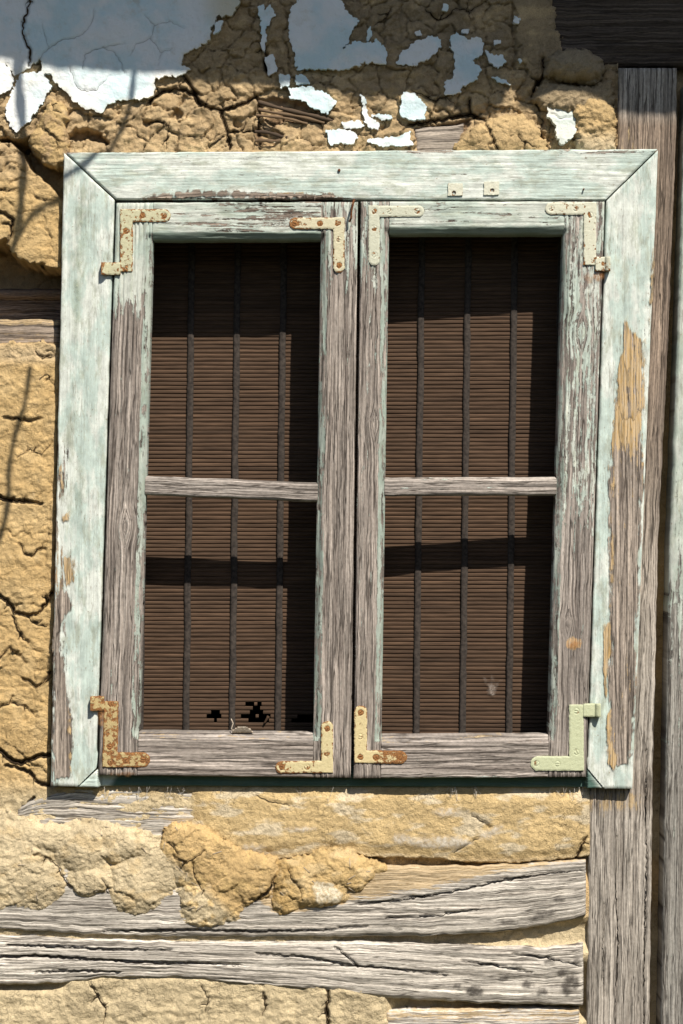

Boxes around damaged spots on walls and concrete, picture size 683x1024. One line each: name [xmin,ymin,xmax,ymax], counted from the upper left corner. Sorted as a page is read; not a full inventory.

crack [21,0,180,91]
flaking render [0,0,241,133]
crack [148,75,265,149]
flaking render [325,92,427,147]
flaking render [258,0,522,115]
flaking render [546,107,577,146]
crack [0,496,39,504]
peeling [603,321,650,770]
crack [0,591,54,717]
crack [0,750,51,800]
crack [1,838,619,1024]